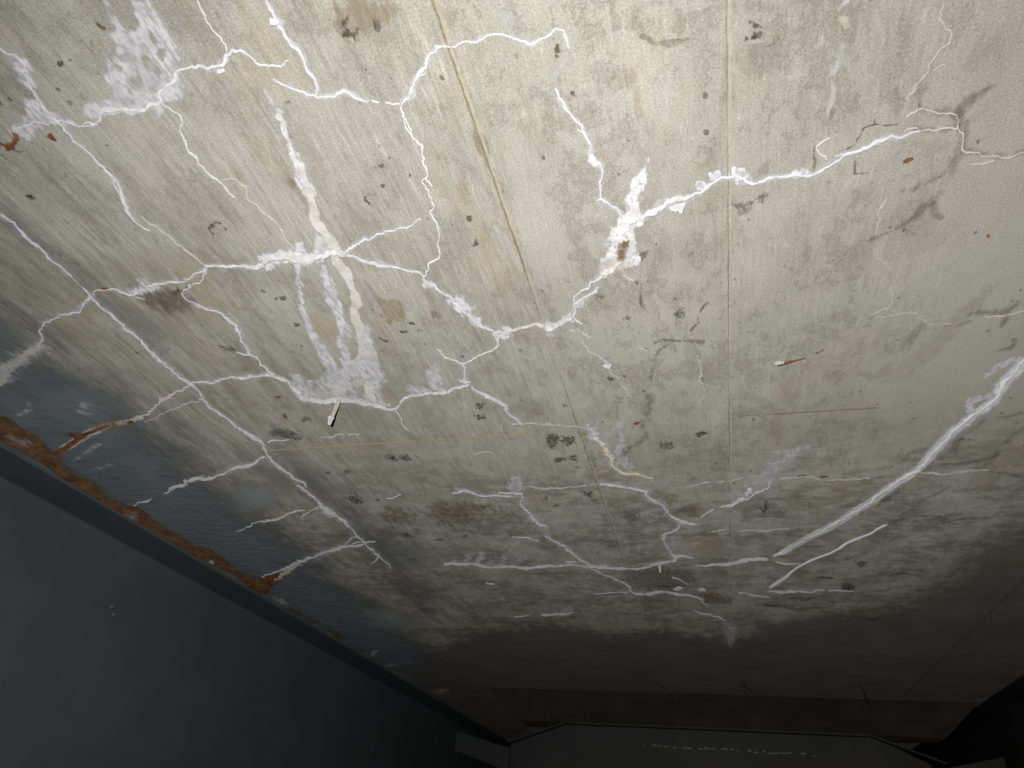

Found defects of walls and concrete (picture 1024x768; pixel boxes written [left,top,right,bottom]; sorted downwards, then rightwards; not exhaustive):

corrosion [0,133,19,151]
damp [263,90,390,406]
crack [0,0,1024,580]
corrosion [0,386,255,588]
crack [444,476,726,621]
crack [739,589,854,598]